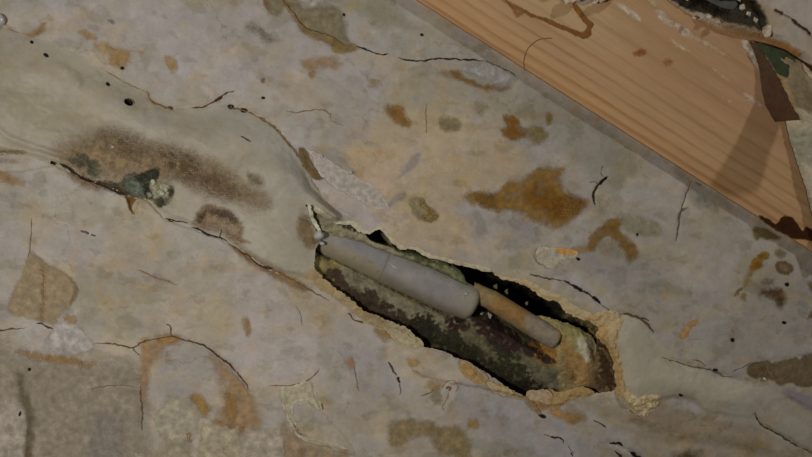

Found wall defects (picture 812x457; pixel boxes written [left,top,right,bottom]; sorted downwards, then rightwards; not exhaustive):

crack [283,0,515,75]
corrosion [439,119,459,130]
corrosion [502,113,552,143]
damp [62,134,266,207]
flaking render [306,150,390,210]
corrosion [466,168,587,227]
crack [591,165,608,204]
corrosion [573,217,659,261]
flaking render [302,203,661,418]
crack [95,324,248,388]
damp [747,354,812,387]
flaking render [198,425,285,457]